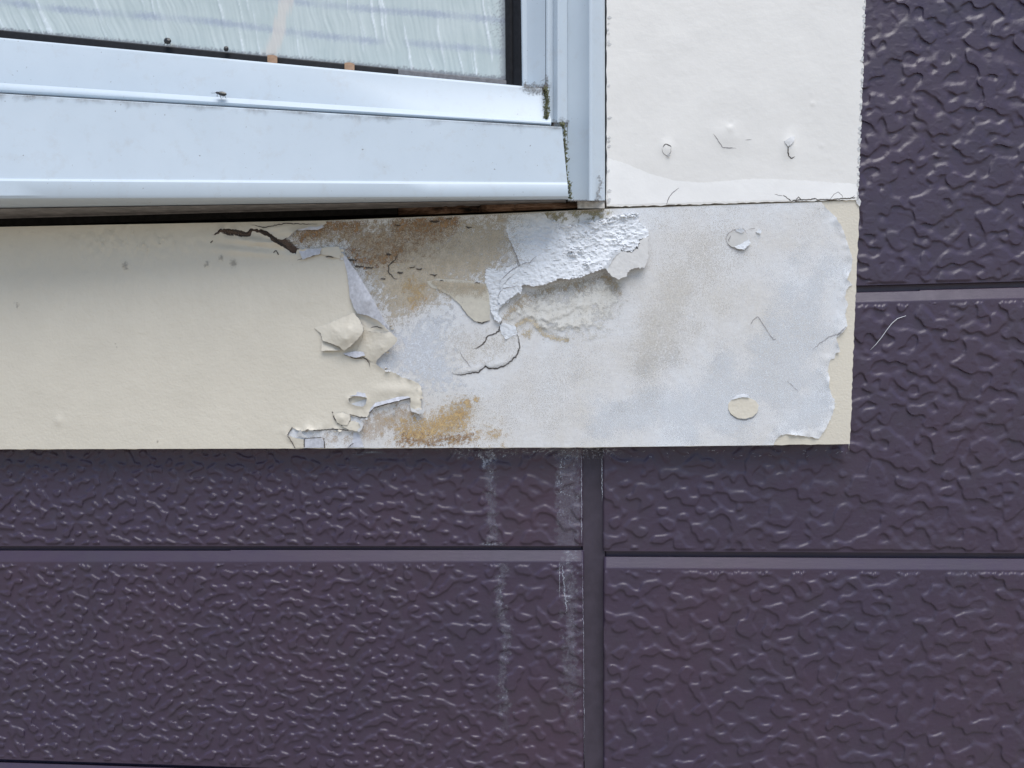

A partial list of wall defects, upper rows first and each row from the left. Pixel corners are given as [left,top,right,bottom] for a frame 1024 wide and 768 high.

corrosion [296,216,465,313]
peeling [286,189,853,448]
corrosion [305,395,506,448]
water stain [462,448,584,540]